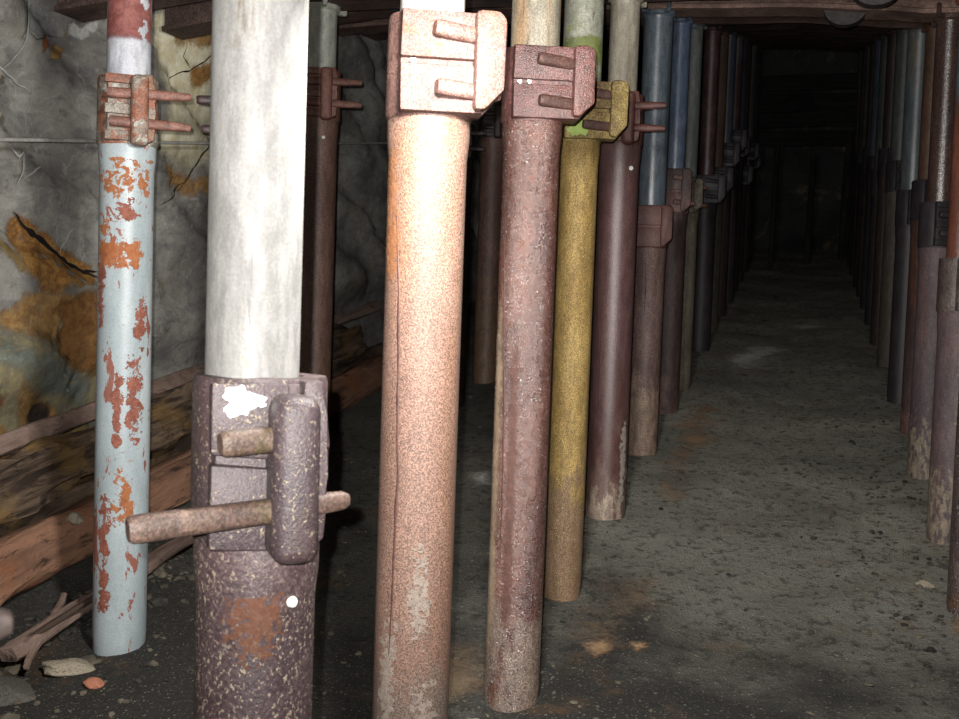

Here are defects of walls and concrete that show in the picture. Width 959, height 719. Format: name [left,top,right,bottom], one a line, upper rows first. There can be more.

crack [13,212,98,277]
rust [387,149,399,277]
rust [220,592,291,670]